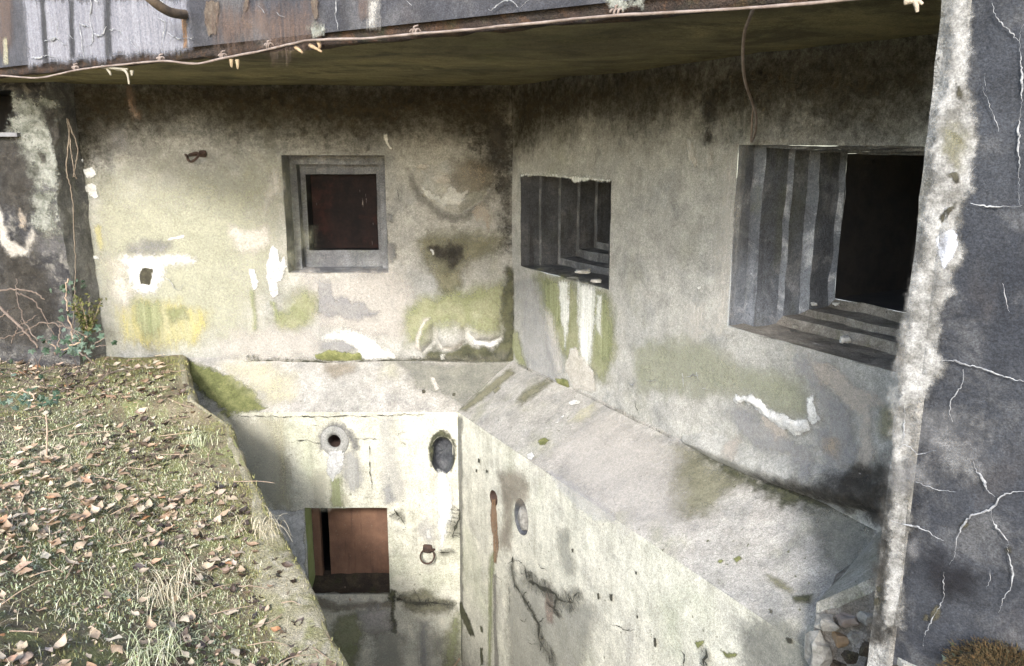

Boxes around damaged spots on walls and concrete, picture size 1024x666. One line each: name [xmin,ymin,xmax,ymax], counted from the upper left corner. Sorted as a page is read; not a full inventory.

damp [74,34,938,251]
crack [967,4,1024,208]
spalling [0,212,34,256]
peeling [112,253,197,302]
damp [97,183,271,336]
peeling [221,282,396,360]
damp [543,281,612,373]
spalling [768,0,979,666]
crack [943,360,1022,422]
rust [488,499,499,666]
damp [556,422,912,608]
crack [893,461,1024,640]